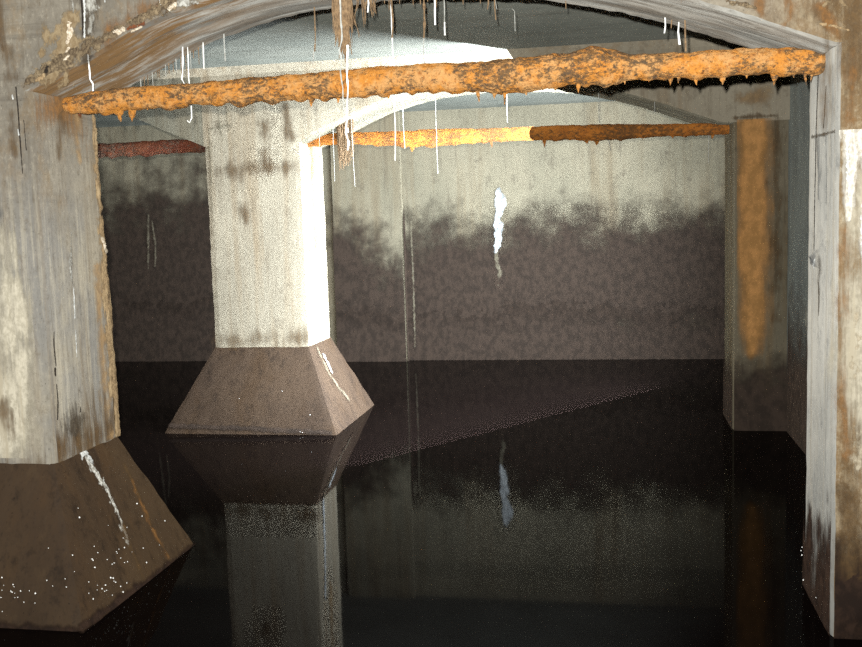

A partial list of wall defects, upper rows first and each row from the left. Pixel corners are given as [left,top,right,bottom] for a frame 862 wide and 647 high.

water stain [828,0,862,79]
rust [114,110,136,122]
rust [734,114,779,357]
water stain [811,129,862,262]
water stain [332,188,808,454]
water stain [830,270,862,458]
water stain [57,414,129,544]
water stain [802,494,862,640]